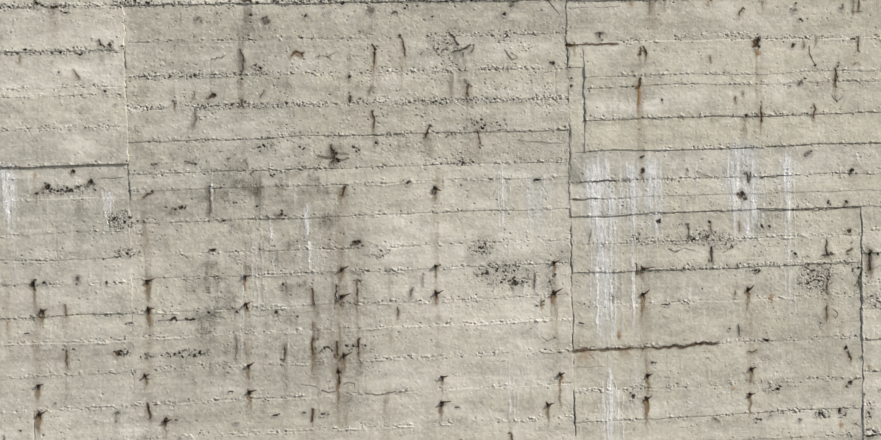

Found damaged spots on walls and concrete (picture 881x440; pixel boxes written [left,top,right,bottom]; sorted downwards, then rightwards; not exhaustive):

efflorescence [584,156,663,342]
efflorescence [727,144,763,236]
efflorescence [782,153,796,292]
efflorescence [602,365,624,440]